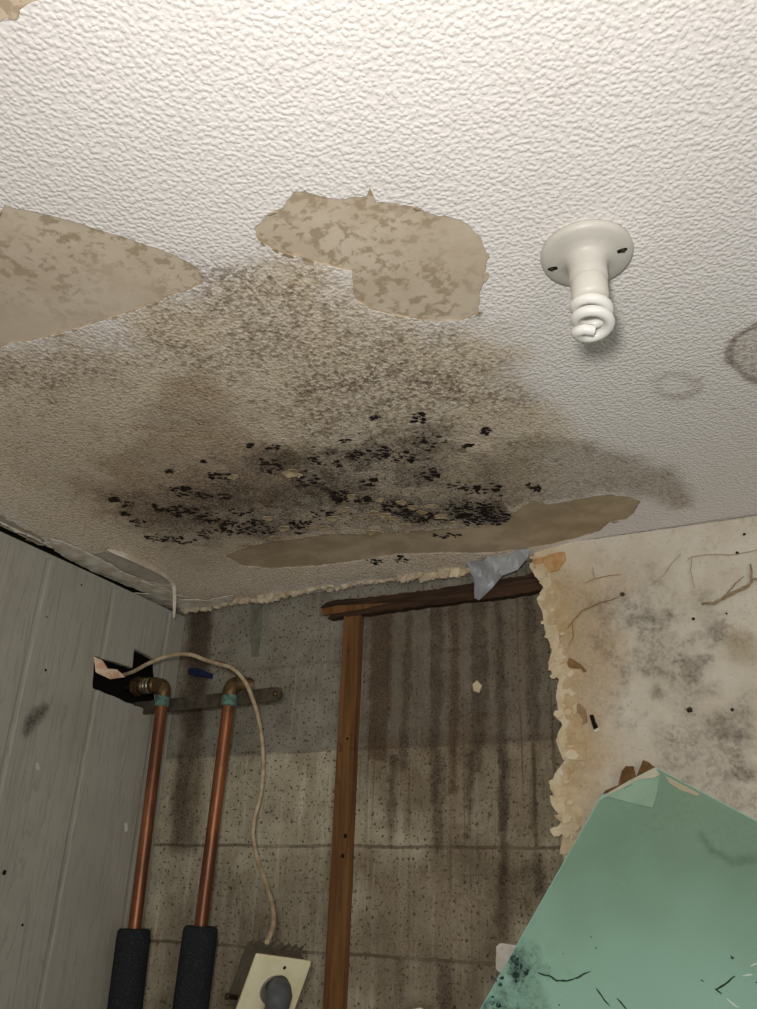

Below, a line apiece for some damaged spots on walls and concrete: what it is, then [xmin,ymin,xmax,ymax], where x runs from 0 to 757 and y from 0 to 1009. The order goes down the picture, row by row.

peeling [0,0,33,21]
peeling [0,205,205,346]
peeling [255,189,489,320]
water stain [0,266,686,600]
peeling [0,515,471,618]
peeling [226,495,640,855]